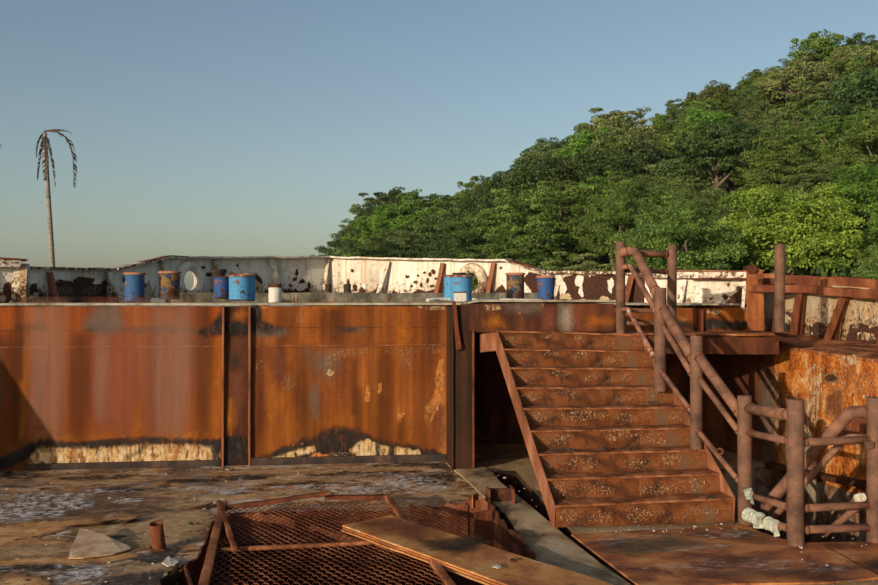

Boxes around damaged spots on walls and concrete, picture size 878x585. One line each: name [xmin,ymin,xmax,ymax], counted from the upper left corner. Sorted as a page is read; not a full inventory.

peeling [0,282,12,303]
peeling [56,276,107,303]
peeling [229,264,269,293]
peeling [283,269,311,293]
peeling [347,269,379,293]
peeling [405,269,445,311]
peeling [808,304,833,338]
peeling [836,304,878,345]
corrosion [20,342,246,444]
corrosion [823,372,842,415]
corrosion [852,418,866,434]
water stain [0,462,455,523]